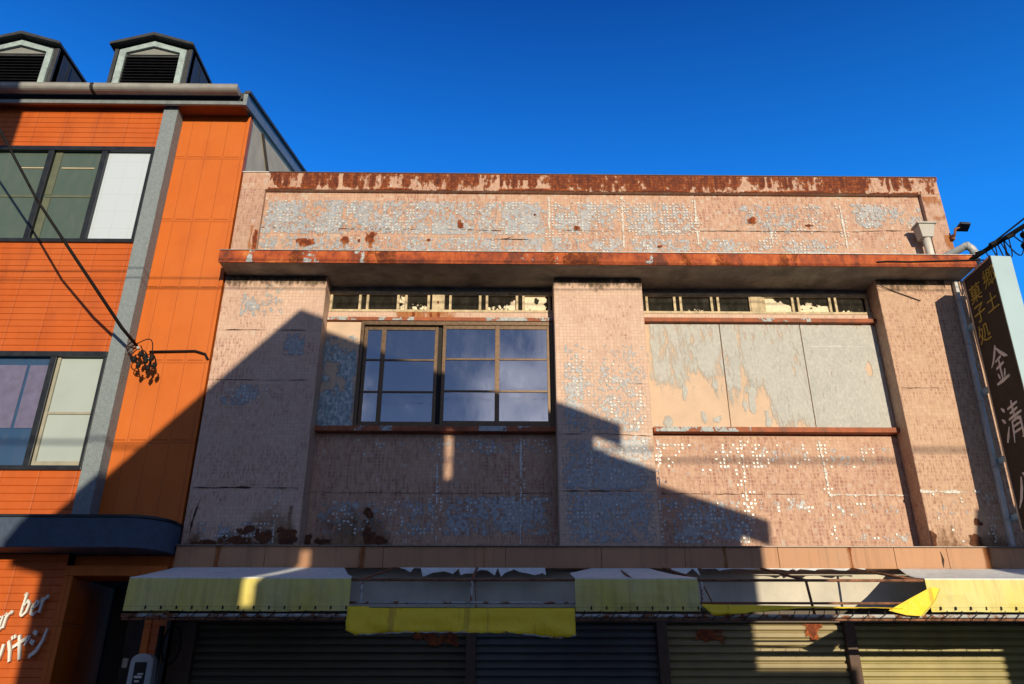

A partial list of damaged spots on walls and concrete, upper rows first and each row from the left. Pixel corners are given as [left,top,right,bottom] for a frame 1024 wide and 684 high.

rust [268,173,941,204]
peeling [246,200,923,264]
rust [545,253,599,264]
peeling [190,296,892,545]
peeling [831,495,903,539]